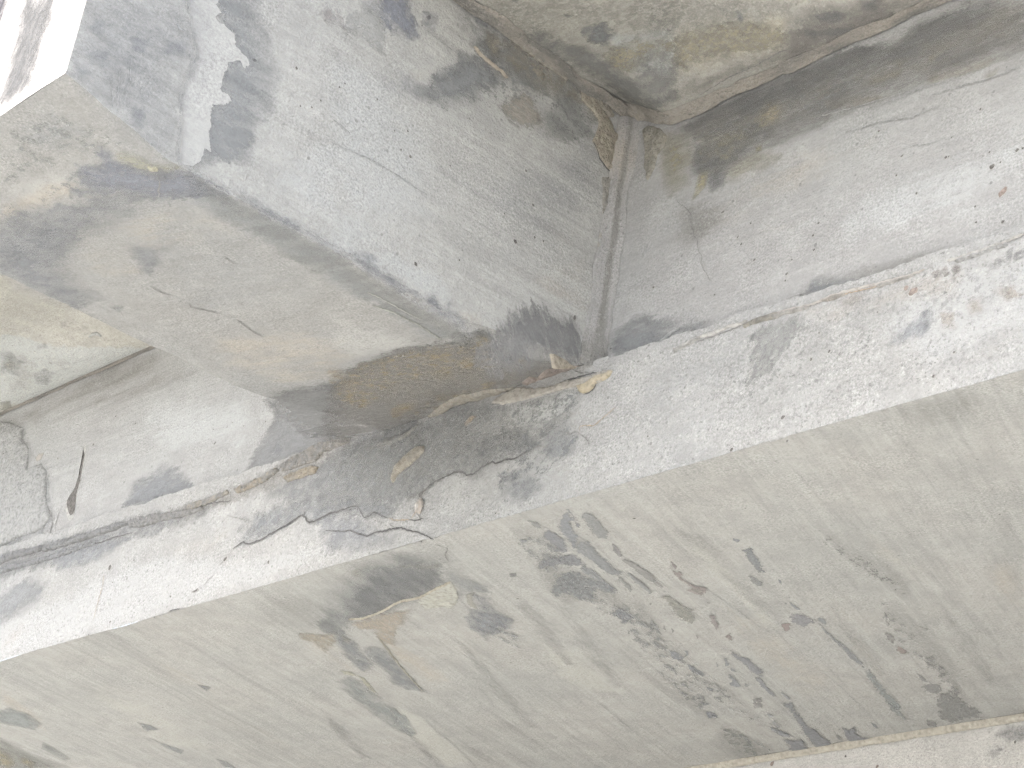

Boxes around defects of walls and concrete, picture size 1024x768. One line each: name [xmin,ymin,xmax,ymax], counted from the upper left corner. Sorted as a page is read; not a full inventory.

peeling [179,0,250,166]
damp [204,0,260,164]
damp [428,21,590,131]
flaking render [579,90,618,171]
damp [693,3,1024,176]
crack [65,444,86,521]
crack [170,408,614,611]
damp [250,299,581,548]
flaking render [464,366,613,433]
damp [320,557,437,734]